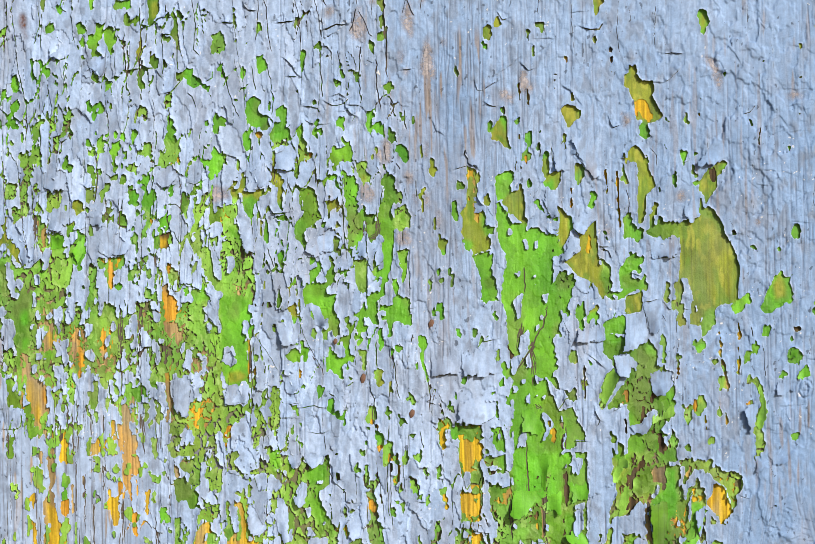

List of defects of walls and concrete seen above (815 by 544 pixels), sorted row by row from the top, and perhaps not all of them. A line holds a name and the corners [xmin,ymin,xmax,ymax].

peeling [71,0,209,100]
peeling [210,7,239,54]
peeling [369,0,388,54]
peeling [473,53,523,149]
peeling [556,77,585,128]
crack [609,10,631,63]
peeling [609,46,689,139]
peeling [697,9,710,35]
peeling [0,37,417,544]
peeling [415,131,752,544]
peeling [760,270,798,313]
peeling [365,383,432,506]